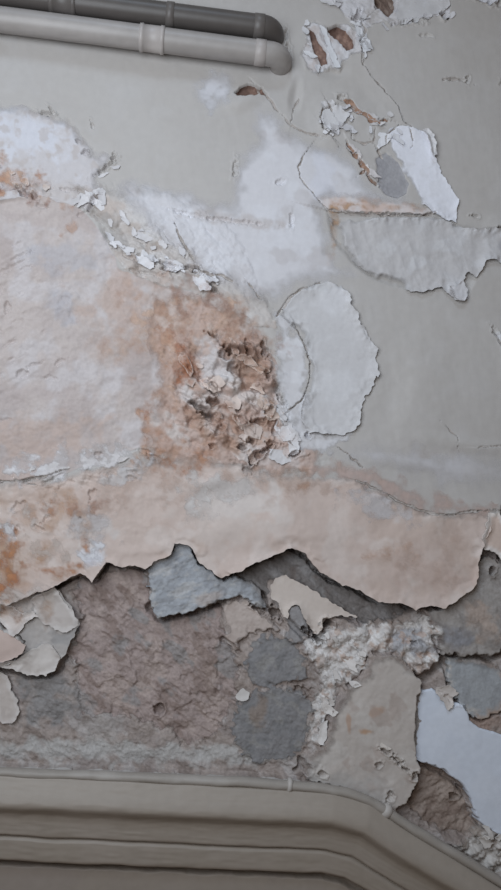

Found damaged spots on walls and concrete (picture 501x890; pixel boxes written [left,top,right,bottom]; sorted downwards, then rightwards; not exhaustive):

crack [256,13,437,217]
peeling [302,0,456,73]
flaking render [0,107,317,481]
leakage [76,186,352,455]
peeling [125,100,501,435]
crack [0,470,62,485]
leakage [3,443,152,486]
crack [338,447,496,516]
leakage [0,586,44,616]
flaking render [0,459,501,876]